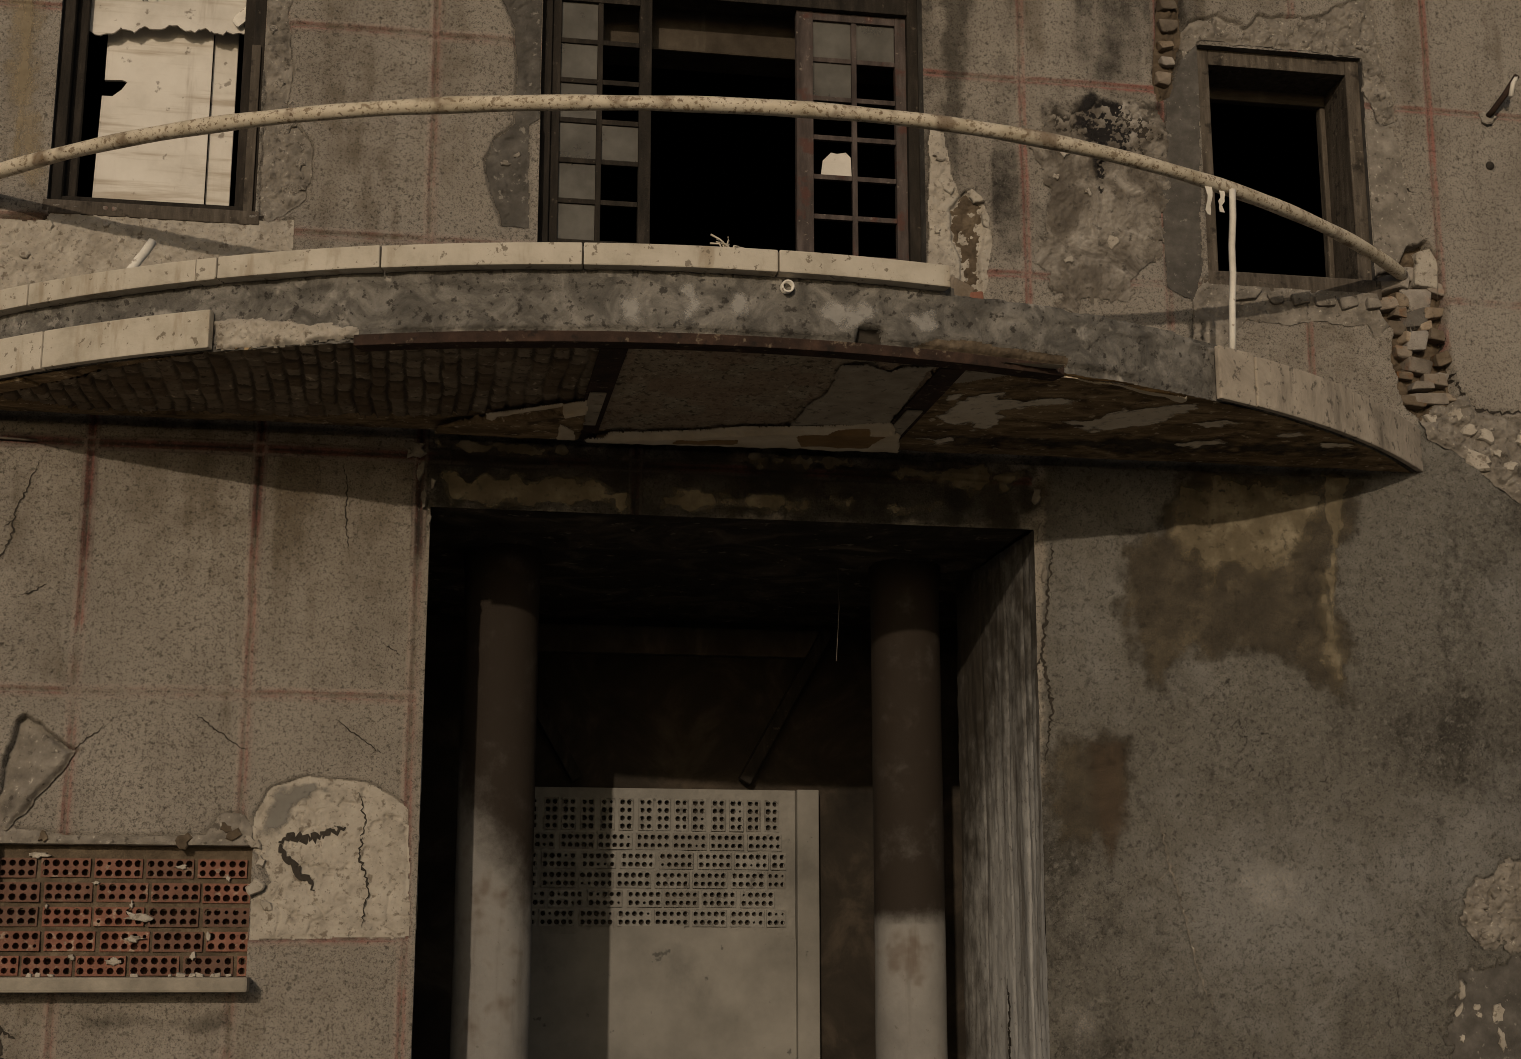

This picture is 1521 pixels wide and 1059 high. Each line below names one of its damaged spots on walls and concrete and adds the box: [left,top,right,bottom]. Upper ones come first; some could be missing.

flaking render [0,0,314,290]
spalling [485,0,542,228]
flaking render [927,130,992,296]
flaking render [1022,0,1394,313]
spalling [0,329,1239,531]
spalling [1193,247,1521,504]
crack [1033,547,1055,764]
water stain [946,436,1364,696]
spalling [0,718,411,940]
water stain [1045,733,1133,848]
spalling [1460,858,1521,954]
crack [0,1026,15,1059]